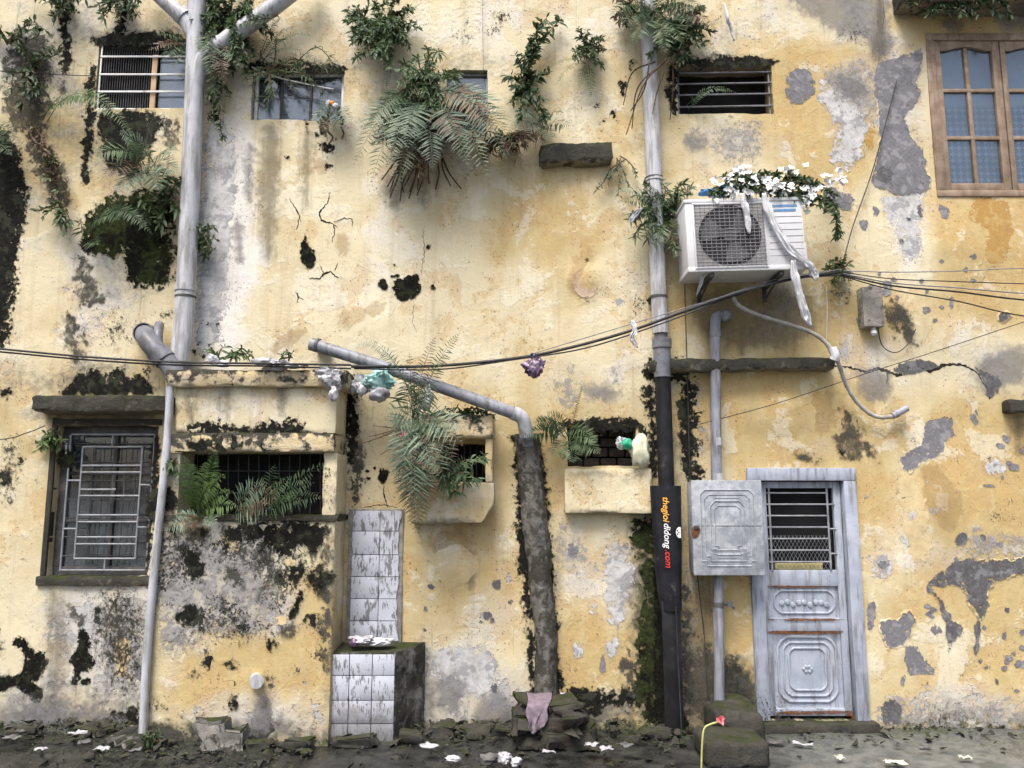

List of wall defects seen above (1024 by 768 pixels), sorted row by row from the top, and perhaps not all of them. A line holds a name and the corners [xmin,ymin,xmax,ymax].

water stain [0,0,184,348]
crack [290,192,353,302]
spalling [785,48,931,263]
water stain [0,586,202,743]
water stain [144,435,337,672]
water stain [507,435,536,692]
corrosion [767,618,843,635]
corrosion [776,710,855,719]
water stain [834,406,880,464]
crack [835,363,990,399]
peeling [872,395,955,562]
spalling [867,525,1024,730]